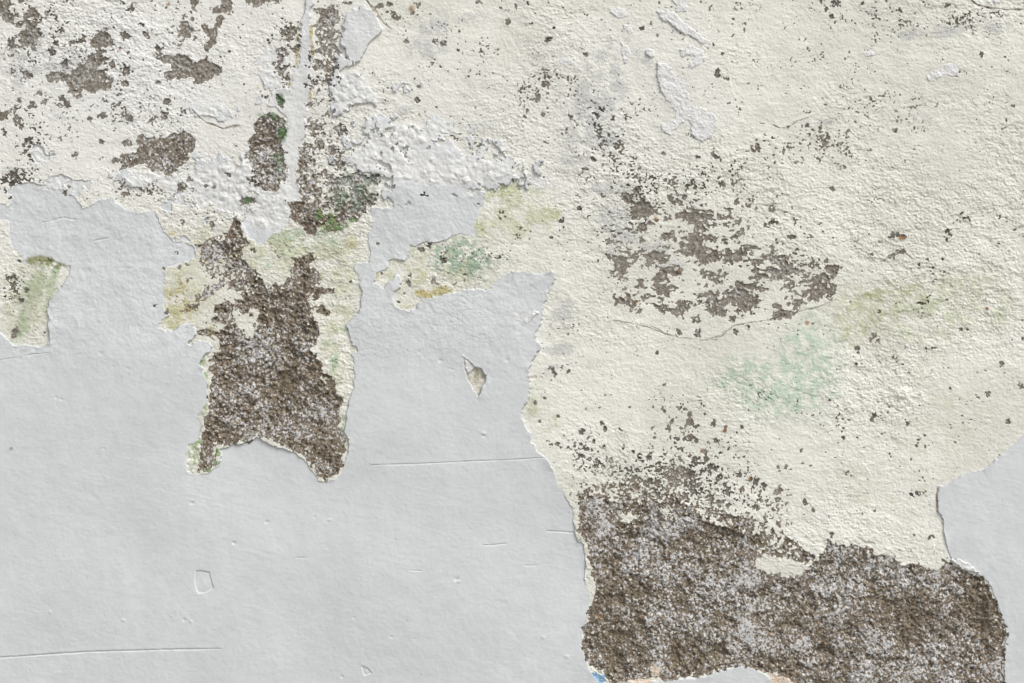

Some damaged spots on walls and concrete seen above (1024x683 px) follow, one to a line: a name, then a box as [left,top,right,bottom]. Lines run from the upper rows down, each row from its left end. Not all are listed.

peeling [0,0,306,347]
flaking render [179,218,349,482]
peeling [240,0,1024,683]